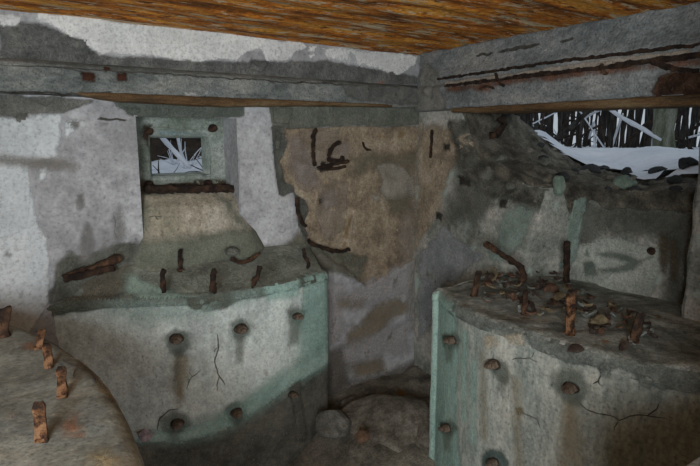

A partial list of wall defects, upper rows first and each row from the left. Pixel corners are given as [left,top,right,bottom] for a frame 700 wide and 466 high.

rust [140,180,235,194]
spalling [271,108,700,393]
rust [61,254,122,283]
crack [187,334,225,390]
crack [580,403,662,430]